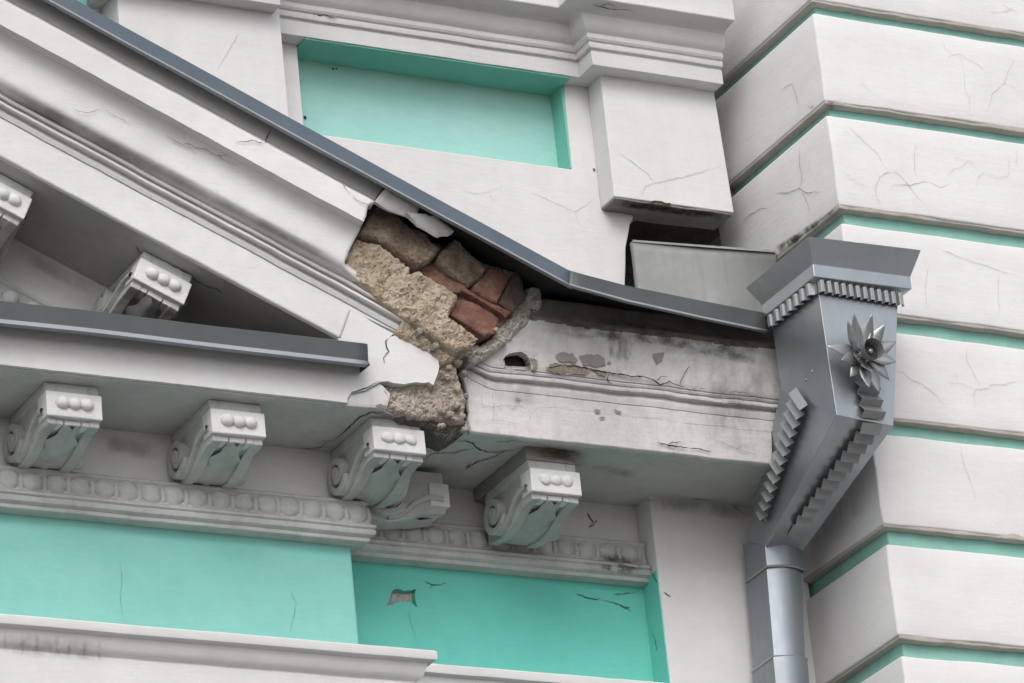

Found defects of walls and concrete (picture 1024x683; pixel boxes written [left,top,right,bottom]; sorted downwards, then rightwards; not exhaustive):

crack [169,130,271,164]
crack [845,127,1017,201]
crack [742,151,812,222]
spalling [343,189,544,452]
peeling [522,352,611,377]
crack [548,364,762,400]
crack [427,391,531,470]
crack [658,440,753,454]
spalling [387,591,413,606]